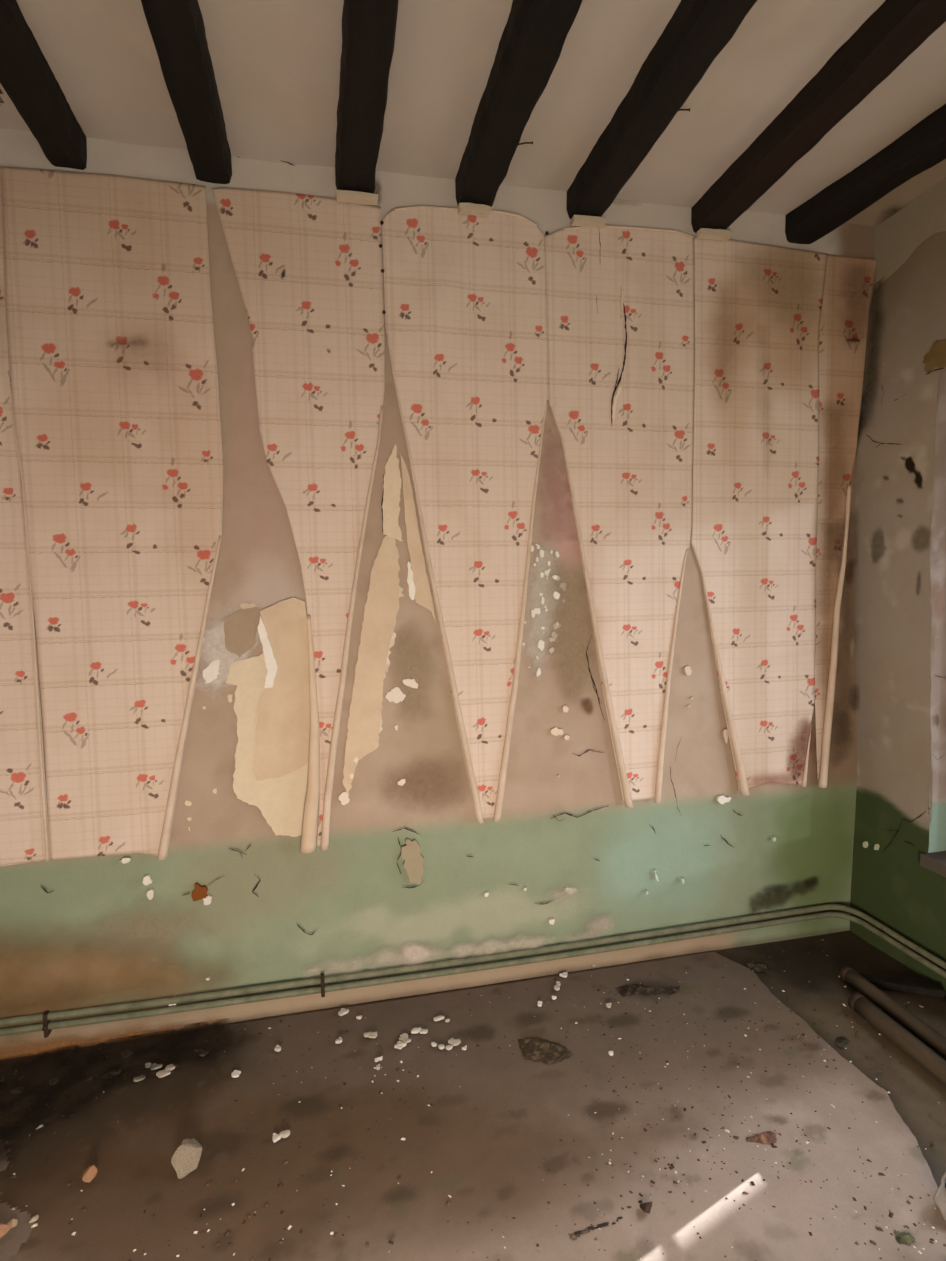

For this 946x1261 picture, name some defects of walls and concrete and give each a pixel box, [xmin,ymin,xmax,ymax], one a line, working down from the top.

peeling [399,454,436,623]
damp [839,523,853,584]
peeling [522,544,566,677]
peeling [386,633,396,673]
peeling [385,679,419,703]
peeling [255,597,320,853]
peeling [550,727,570,740]
damp [791,726,812,775]
peeling [339,757,359,805]
damp [752,879,817,913]
damp [0,915,204,1027]
damp [0,1029,174,1060]